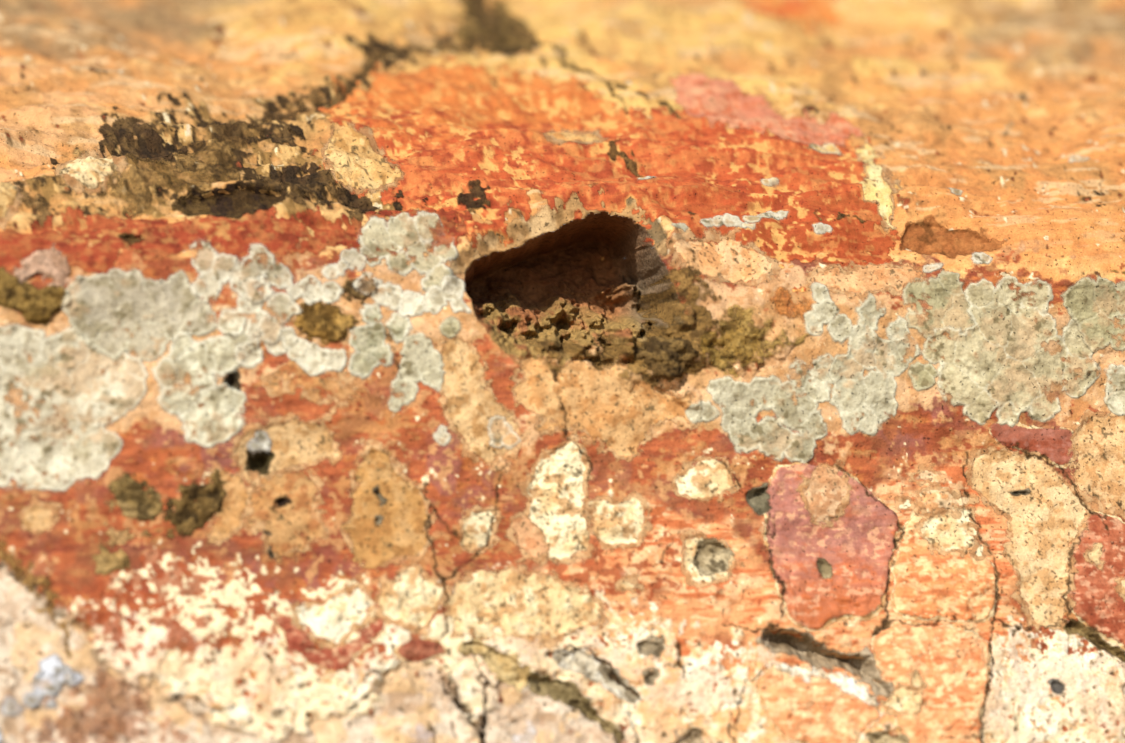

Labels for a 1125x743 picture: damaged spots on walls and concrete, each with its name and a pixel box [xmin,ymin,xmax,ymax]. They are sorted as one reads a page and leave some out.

flaking render [321,122,404,195]
flaking render [543,129,607,145]
flaking render [856,139,902,231]
flaking render [666,228,781,286]
crack [424,467,505,650]
crack [723,513,786,633]
crack [835,443,1122,743]
crack [429,675,490,743]
crack [547,644,643,743]